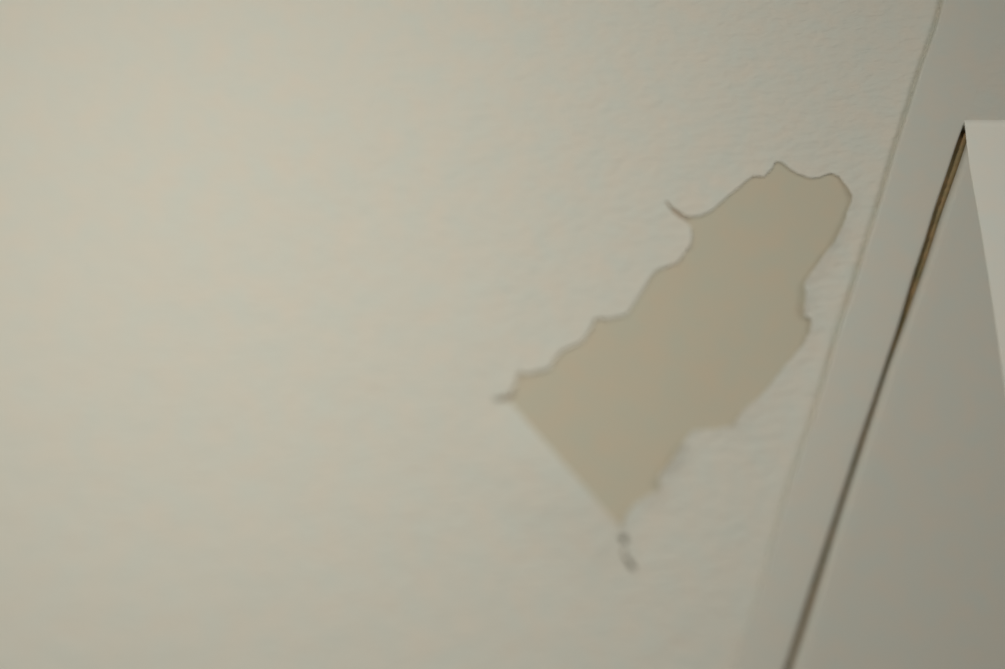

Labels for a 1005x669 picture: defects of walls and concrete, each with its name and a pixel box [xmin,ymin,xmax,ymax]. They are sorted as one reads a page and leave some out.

peeling [454,137,870,600]